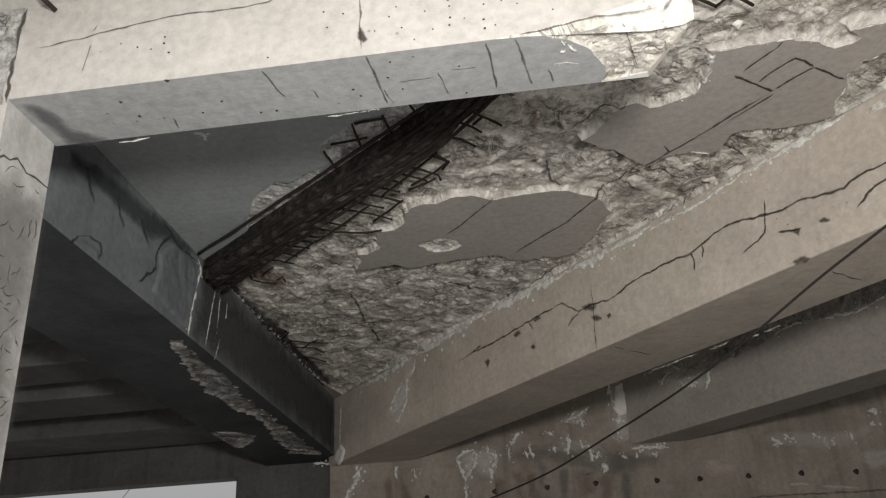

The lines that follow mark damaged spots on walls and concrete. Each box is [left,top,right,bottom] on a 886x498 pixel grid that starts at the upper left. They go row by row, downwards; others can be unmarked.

crack [5,10,27,100]
crack [46,0,271,70]
crack [0,155,48,193]
spalling [228,0,886,395]
crack [517,42,844,252]
crack [465,162,886,358]
spalling [170,340,322,455]
damp [602,383,626,440]
damp [344,466,366,498]
damp [456,431,523,498]
damp [543,431,609,473]
damp [619,442,669,459]